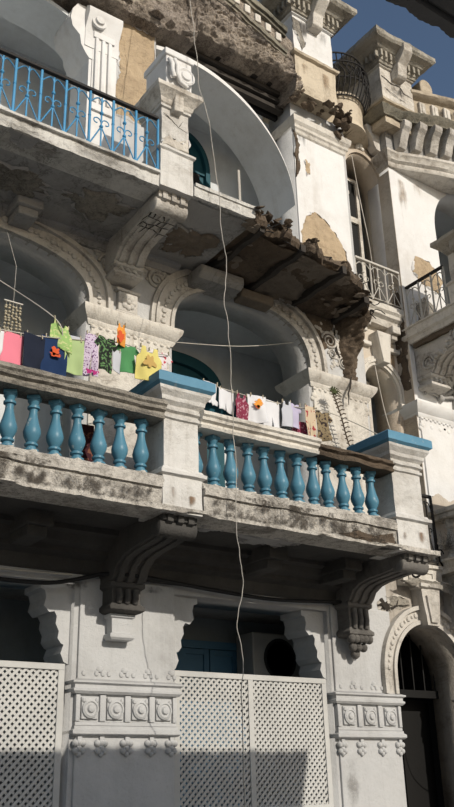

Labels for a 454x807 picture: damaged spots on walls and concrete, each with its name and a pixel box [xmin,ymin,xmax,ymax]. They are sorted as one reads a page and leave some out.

peeling [292,17,306,50]
peeling [115,23,155,125]
flaking render [159,224,220,258]
spalling [300,212,348,261]
spalling [412,256,443,321]
flaking render [304,312,335,350]
peeling [366,285,412,391]
damp [0,451,152,503]